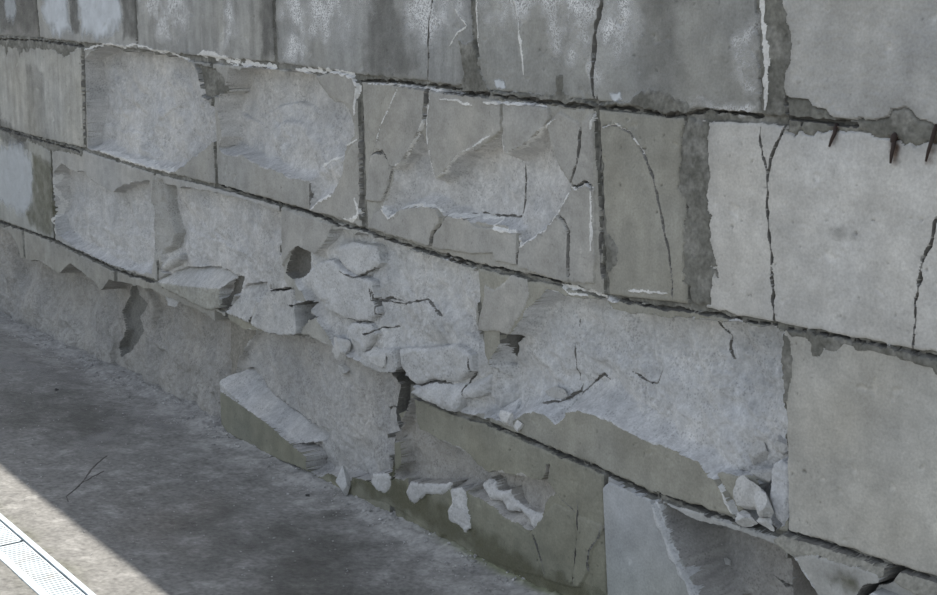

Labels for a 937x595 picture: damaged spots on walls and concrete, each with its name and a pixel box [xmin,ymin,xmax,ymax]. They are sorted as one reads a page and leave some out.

crack [423,0,433,128]
spalling [85,45,595,284]
crack [358,112,393,220]
crack [428,214,449,246]
crack [472,165,527,218]
crack [559,216,570,277]
crack [570,0,673,300]
crack [758,95,796,323]
crack [912,219,937,350]
spalling [0,163,879,595]